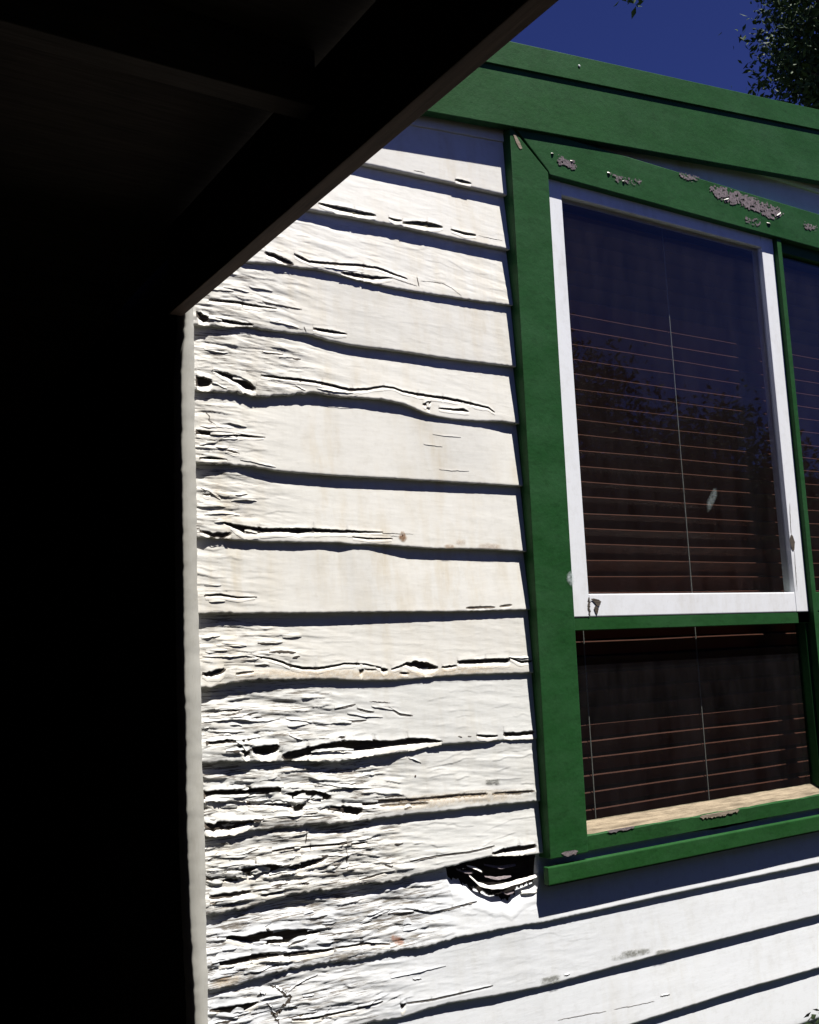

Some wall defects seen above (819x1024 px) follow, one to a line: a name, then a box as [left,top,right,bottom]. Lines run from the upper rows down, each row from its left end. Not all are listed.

peeling [553,153,577,170]
peeling [710,185,784,225]
peeling [202,632,314,682]
peeling [357,652,532,679]
peeling [203,705,535,825]
peeling [206,837,366,908]
peeling [359,862,395,883]
hole [445,837,539,901]
peeling [360,909,417,932]
peeling [209,910,389,981]
peeling [209,991,382,1024]